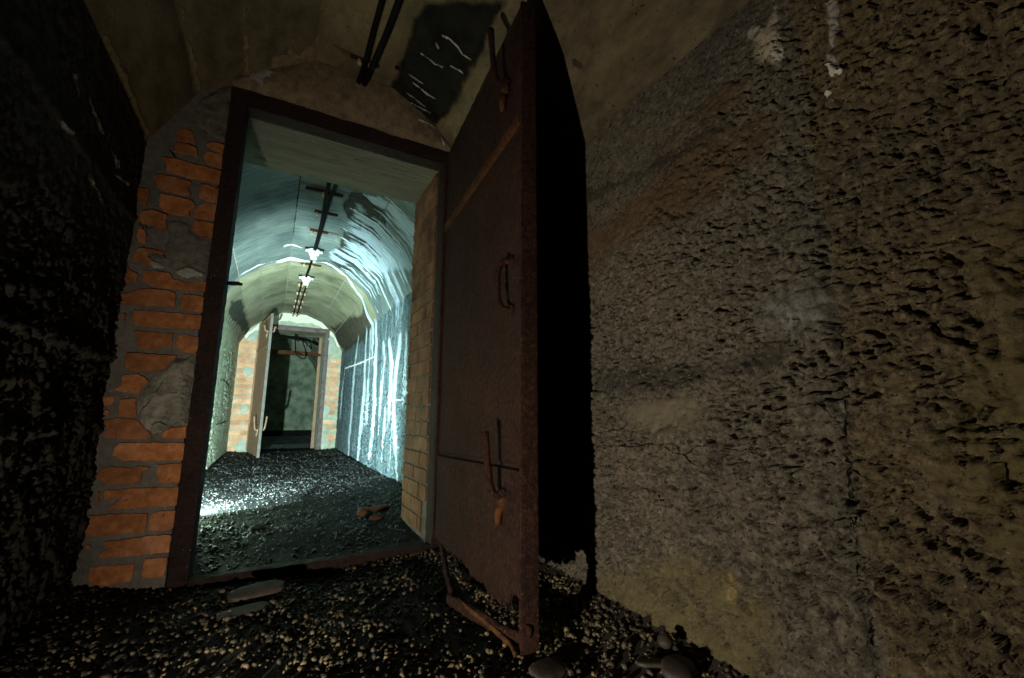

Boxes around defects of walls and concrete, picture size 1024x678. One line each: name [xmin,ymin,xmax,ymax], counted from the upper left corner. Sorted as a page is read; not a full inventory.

damp [391,1,501,127]
damp [823,0,843,77]
crack [789,325,876,669]